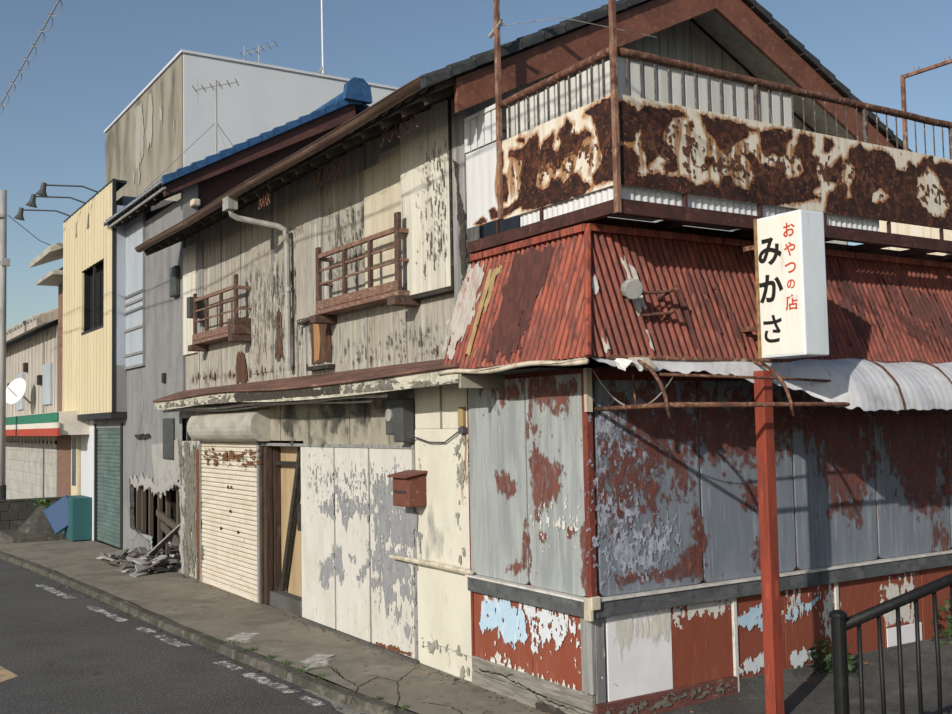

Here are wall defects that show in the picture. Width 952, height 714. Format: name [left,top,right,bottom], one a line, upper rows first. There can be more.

corrosion [474,95,952,230]
peeling [340,260,506,367]
corrosion [481,244,554,364]
corrosion [673,268,745,349]
flaking render [130,439,203,578]
corrosion [196,445,262,580]
peeling [479,369,758,594]
peeling [318,478,470,679]
crack [327,665,486,714]
crack [423,638,585,714]
peeling [479,595,587,694]
peeling [878,573,915,628]